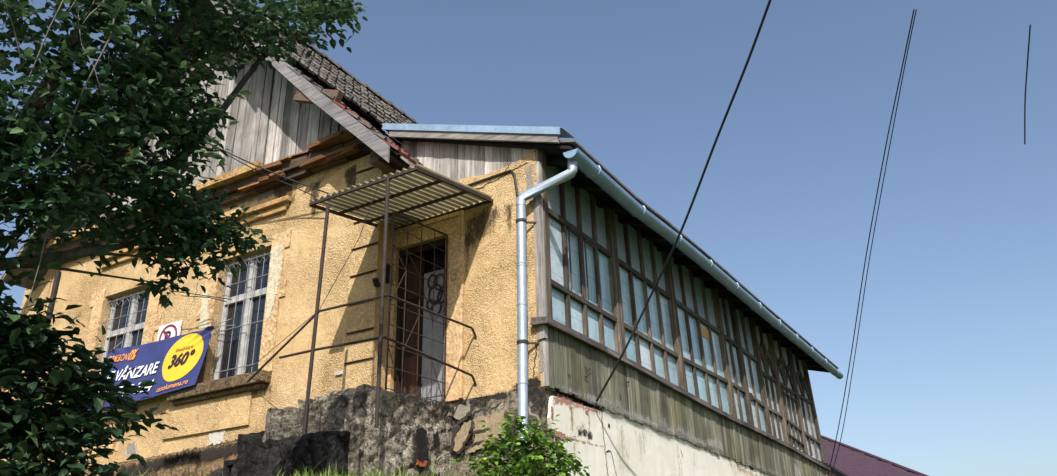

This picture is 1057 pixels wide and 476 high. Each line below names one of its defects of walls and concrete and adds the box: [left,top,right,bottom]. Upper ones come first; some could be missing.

leakage [465,204,512,271]
peeling [528,374,722,449]
leakage [117,439,238,475]